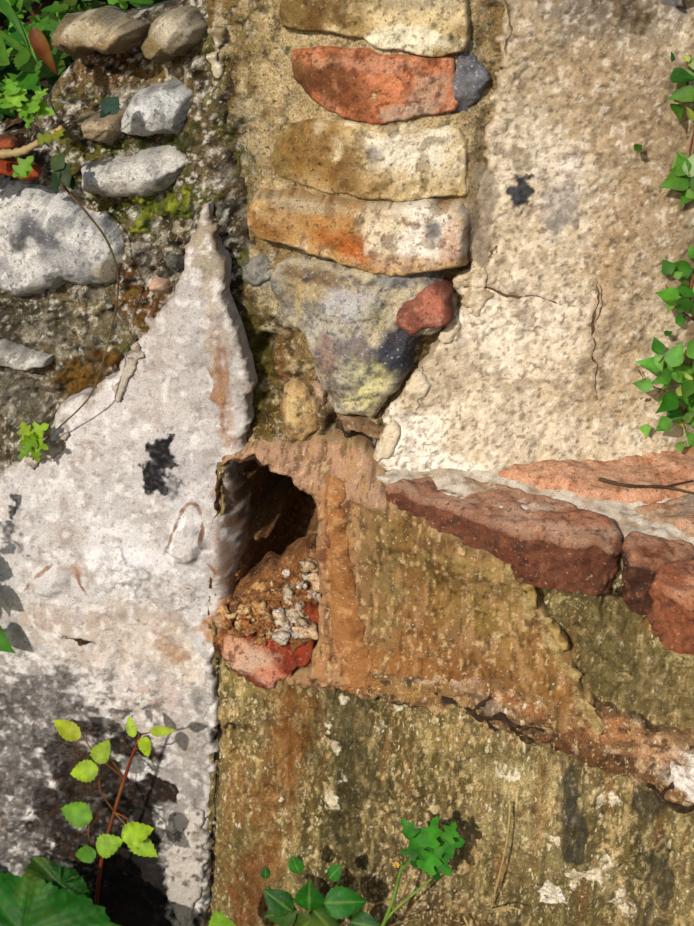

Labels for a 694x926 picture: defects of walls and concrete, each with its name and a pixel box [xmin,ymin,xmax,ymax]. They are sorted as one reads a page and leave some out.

crack [464,286,557,304]
crack [591,281,603,400]
leakage [138,434,179,496]
peeling [92,542,195,611]
spalling [208,454,321,690]
leakage [0,670,179,926]
leakage [192,895,208,926]